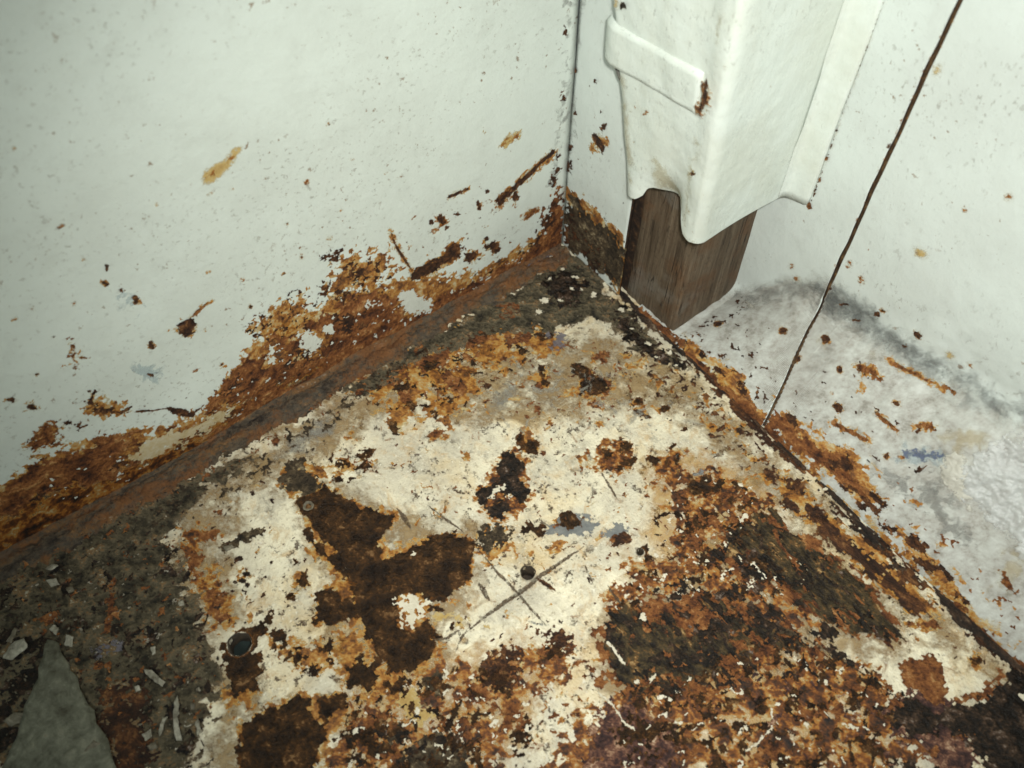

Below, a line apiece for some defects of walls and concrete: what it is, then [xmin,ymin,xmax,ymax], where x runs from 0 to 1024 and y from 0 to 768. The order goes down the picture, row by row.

rust [0,147,626,552]
spalling [570,363,617,412]
peeling [3,638,28,660]
peeling [158,696,182,741]
spalling [196,446,568,768]
rust [0,297,1024,768]
spalling [683,469,724,502]
spalling [589,577,860,731]
spalling [745,708,773,752]
spalling [715,505,907,650]
spalling [878,666,1024,768]
peeling [939,431,1024,560]